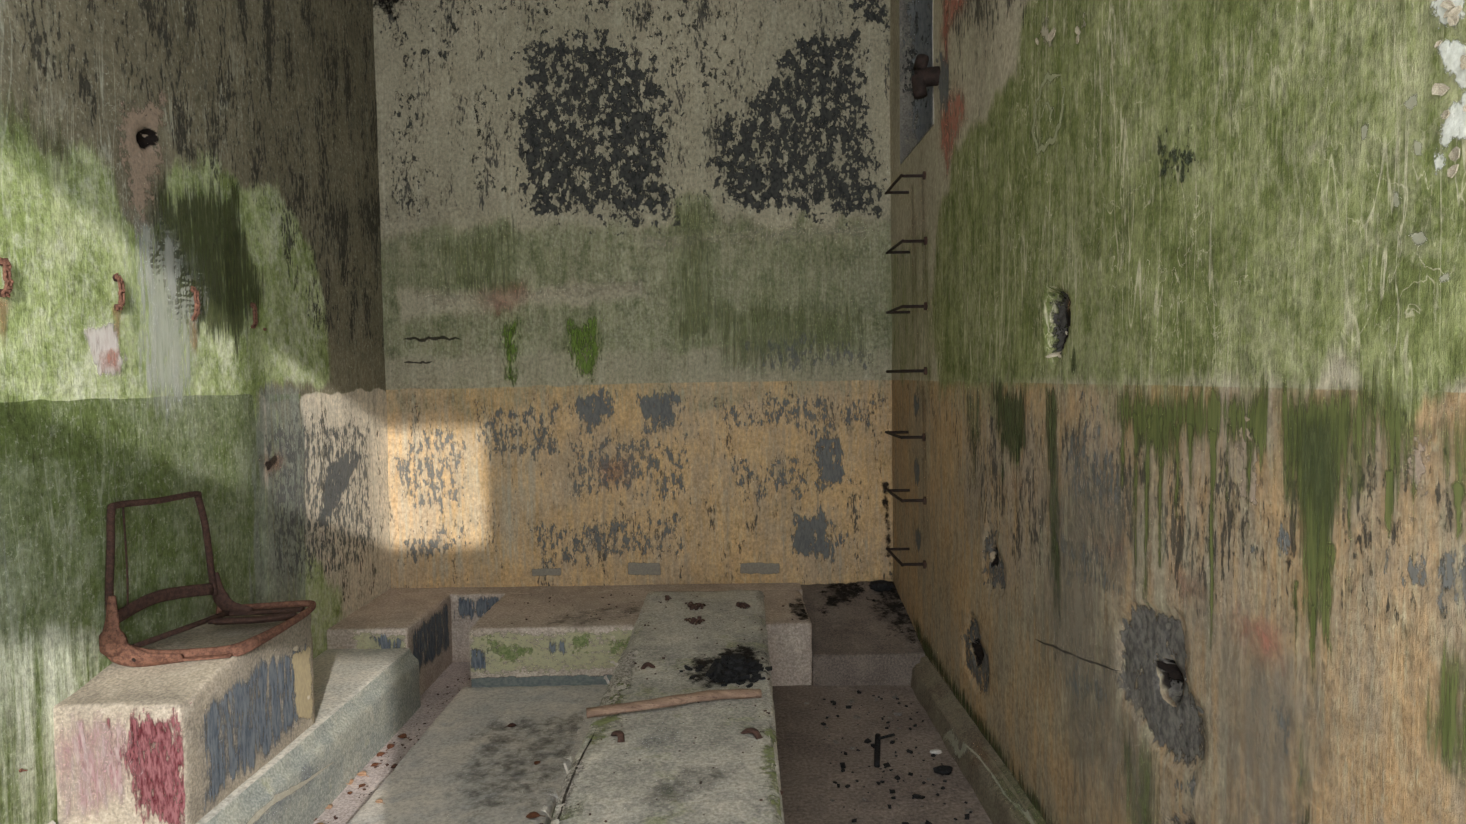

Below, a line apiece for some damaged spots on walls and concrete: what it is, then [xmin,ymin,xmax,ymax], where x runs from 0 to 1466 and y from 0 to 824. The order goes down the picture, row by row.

damp [373,0,949,371]
damp [500,320,521,387]
damp [564,312,602,382]
hole [1046,290,1071,358]
spalling [983,527,1006,590]
damp [1081,376,1466,667]
spalling [960,618,989,692]
spalling [1114,600,1205,824]